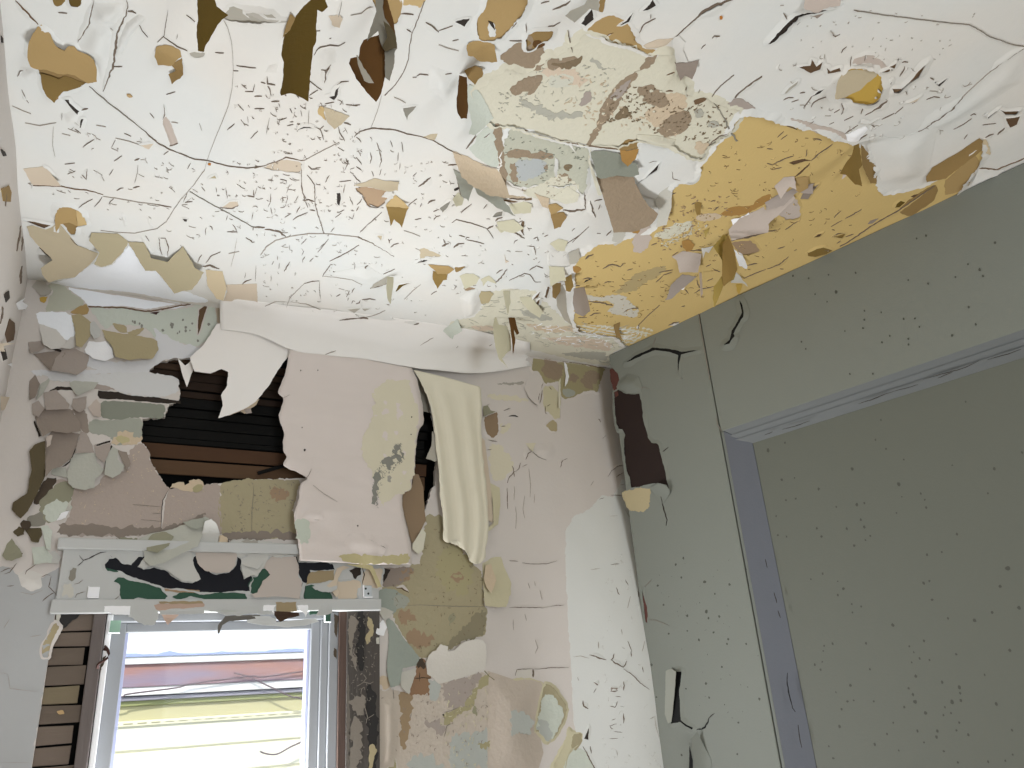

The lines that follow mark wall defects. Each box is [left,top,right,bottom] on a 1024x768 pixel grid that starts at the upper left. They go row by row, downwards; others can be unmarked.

peeling [50,0,86,10]
peeling [222,2,295,37]
peeling [369,0,429,27]
peeling [23,23,101,103]
peeling [154,45,208,84]
peeling [318,106,349,129]
peeling [351,178,409,227]
crack [0,0,1024,381]
peeling [417,0,1006,512]
flaking render [2,201,511,768]
peeling [665,669,676,723]
flaking render [534,681,594,768]